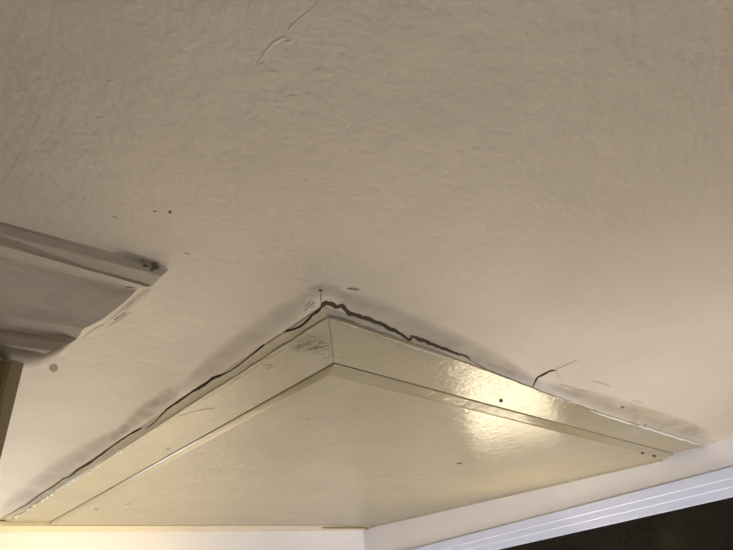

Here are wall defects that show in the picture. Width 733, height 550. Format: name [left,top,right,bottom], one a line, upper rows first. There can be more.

crack [6,289,611,516]